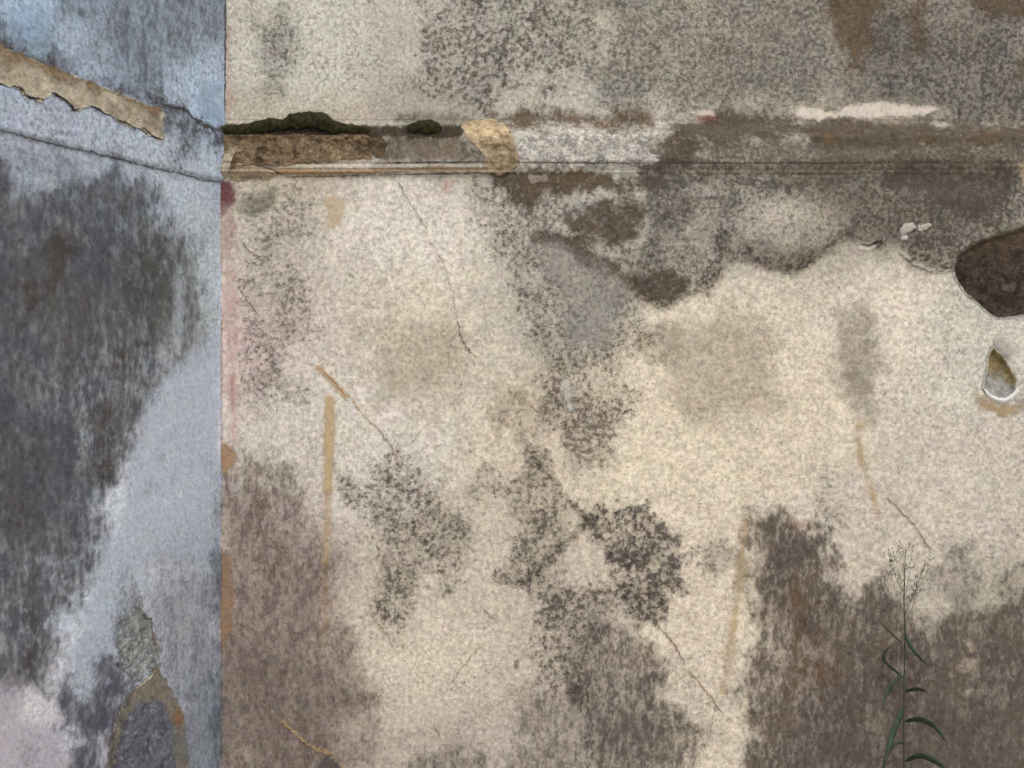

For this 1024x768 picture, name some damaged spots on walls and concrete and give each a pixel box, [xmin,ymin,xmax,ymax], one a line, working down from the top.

flaking render [0,45,165,140]
flaking render [220,133,388,181]
crack [293,161,486,357]
leakage [107,0,1024,467]
flaking render [952,226,1024,319]
flaking render [105,566,190,768]
leakage [0,149,375,768]
rust [316,366,346,507]
crack [310,364,418,473]
leakage [340,450,470,633]
leakage [472,444,1024,768]
flaking render [982,334,1019,403]